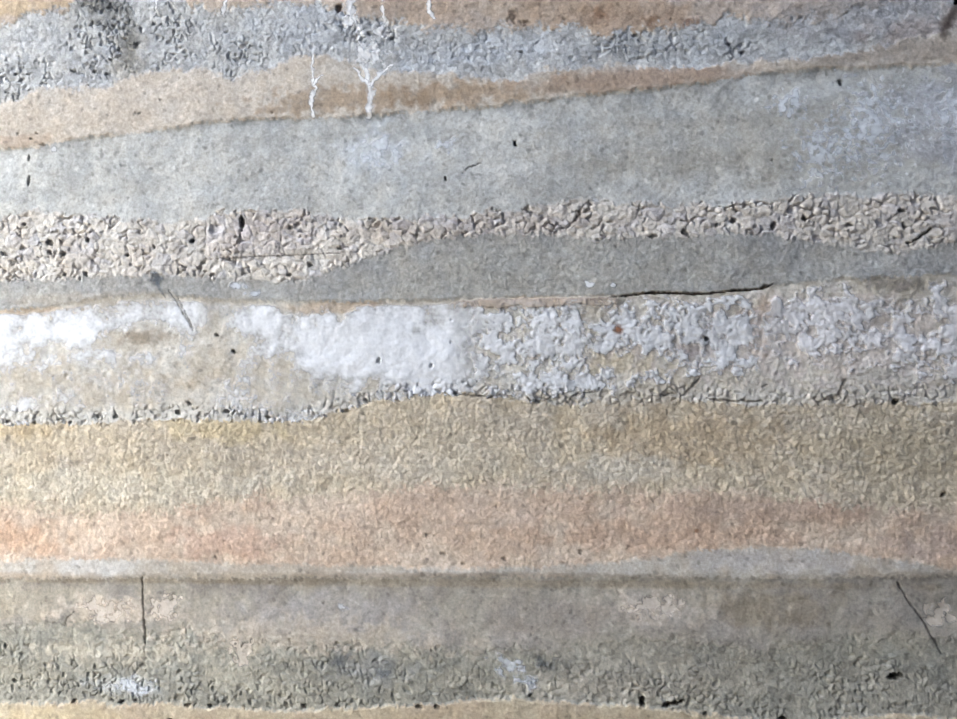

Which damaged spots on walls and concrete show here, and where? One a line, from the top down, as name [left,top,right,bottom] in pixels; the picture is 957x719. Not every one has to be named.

damp [309,55,323,118]
damp [343,0,393,119]
crack [621,284,773,297]